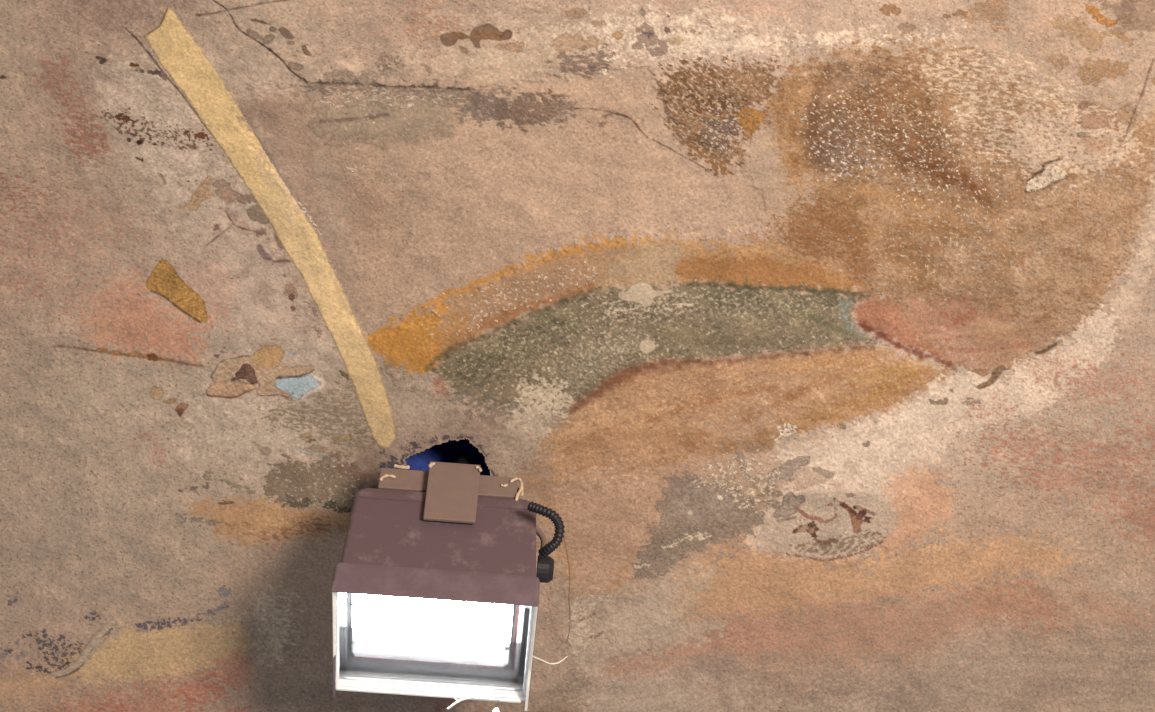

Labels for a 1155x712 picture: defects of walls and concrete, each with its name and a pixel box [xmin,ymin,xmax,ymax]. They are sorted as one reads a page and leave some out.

crack [96,34,203,123]
crack [196,0,470,90]
leakage [546,43,615,79]
corrosion [1086,0,1155,46]
leakage [288,51,576,229]
leakage [778,49,1133,312]
peeling [206,345,325,400]
leakage [203,375,488,513]
spalling [405,438,490,476]
peeling [661,532,712,549]
leakage [632,364,838,580]
spalling [691,450,886,561]